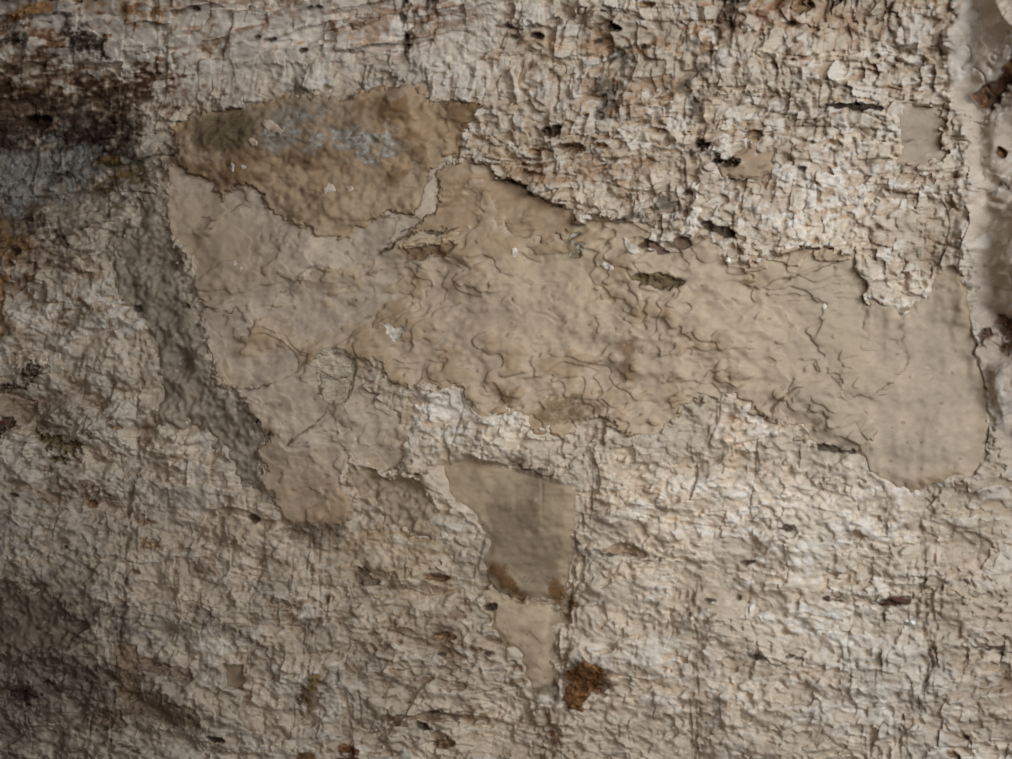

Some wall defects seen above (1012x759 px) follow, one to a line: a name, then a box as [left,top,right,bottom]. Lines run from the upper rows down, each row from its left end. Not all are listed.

crack [399,0,409,54]
spalling [825,102,884,112]
water stain [258,105,396,164]
water stain [0,148,92,206]
spalling [622,182,735,255]
spalling [398,236,459,261]
spalling [631,271,686,291]
peeling [726,245,853,273]
crack [742,262,837,288]
spalling [315,347,357,405]
spalling [816,443,856,454]
corrosion [563,657,607,712]